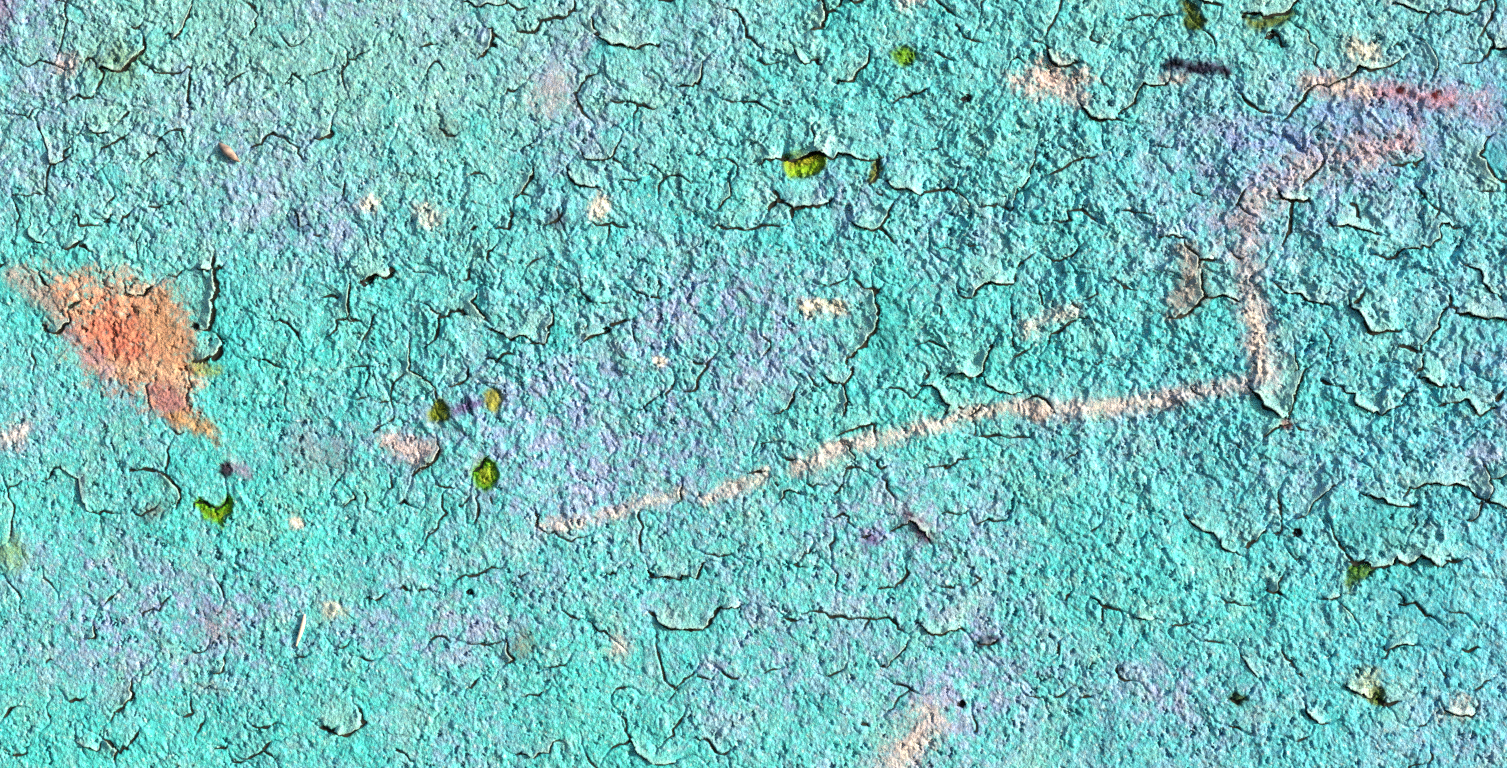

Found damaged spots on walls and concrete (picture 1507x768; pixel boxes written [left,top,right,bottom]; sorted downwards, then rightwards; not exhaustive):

spalling [892,47,915,66]
spalling [783,153,826,178]
crack [0,0,1507,433]
spalling [427,399,449,421]
crack [7,431,228,536]
spalling [195,495,233,528]
crack [335,440,492,542]
spalling [472,458,499,491]
crack [747,158,1507,768]
spalling [1345,563,1375,592]
crack [516,511,781,768]
crack [4,670,153,762]